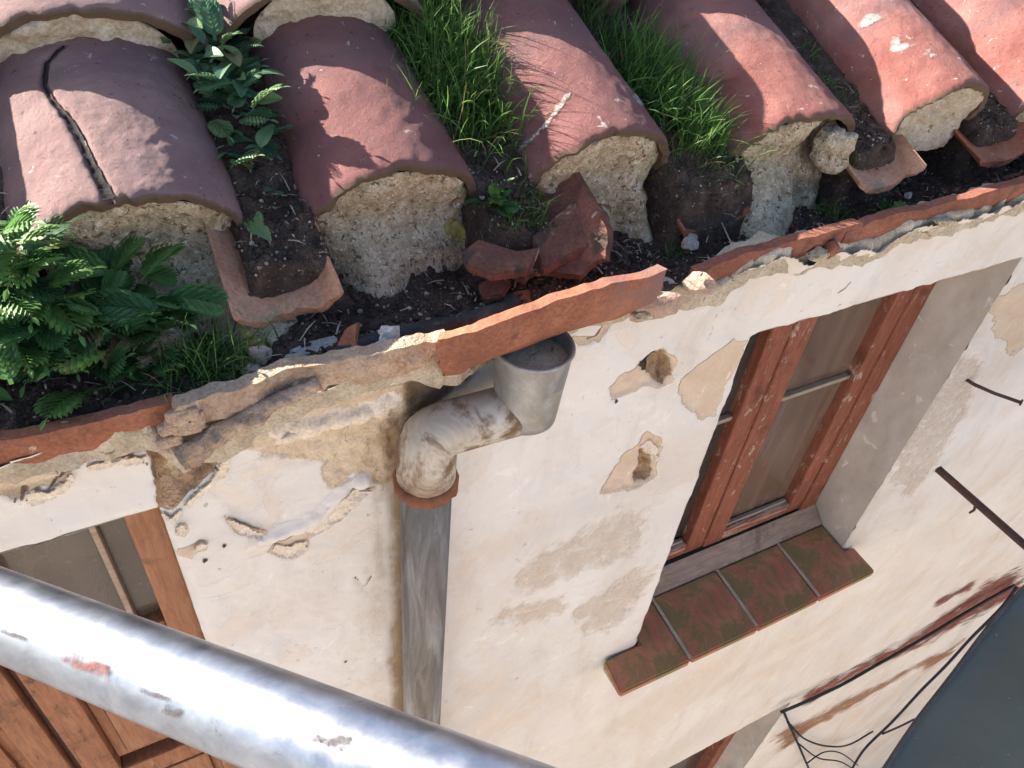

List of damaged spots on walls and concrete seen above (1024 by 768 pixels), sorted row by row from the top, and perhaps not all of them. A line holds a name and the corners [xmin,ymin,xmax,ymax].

crack [42,45,116,200]
spalling [0,329,445,563]
spalling [600,431,663,494]
peeling [610,339,748,420]
peeling [989,283,1024,356]
rust [778,567,1024,749]